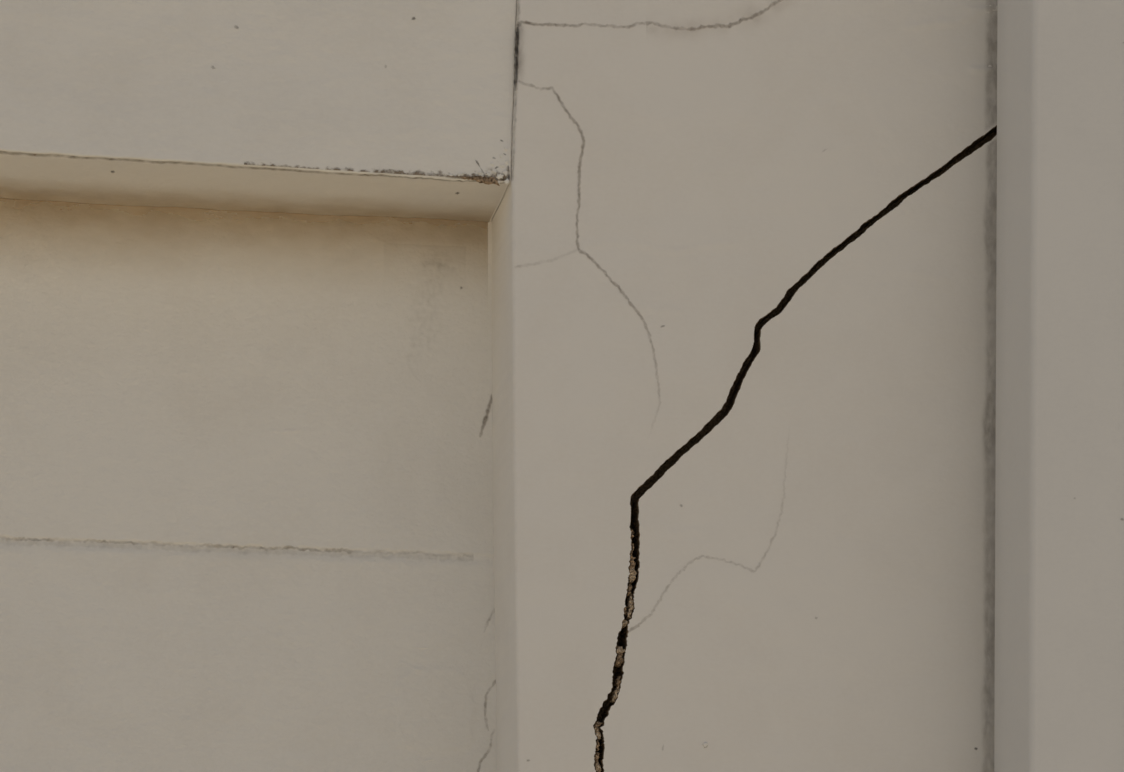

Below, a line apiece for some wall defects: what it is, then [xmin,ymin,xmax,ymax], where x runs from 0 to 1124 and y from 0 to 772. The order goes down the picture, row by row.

crack [593,125,997,772]